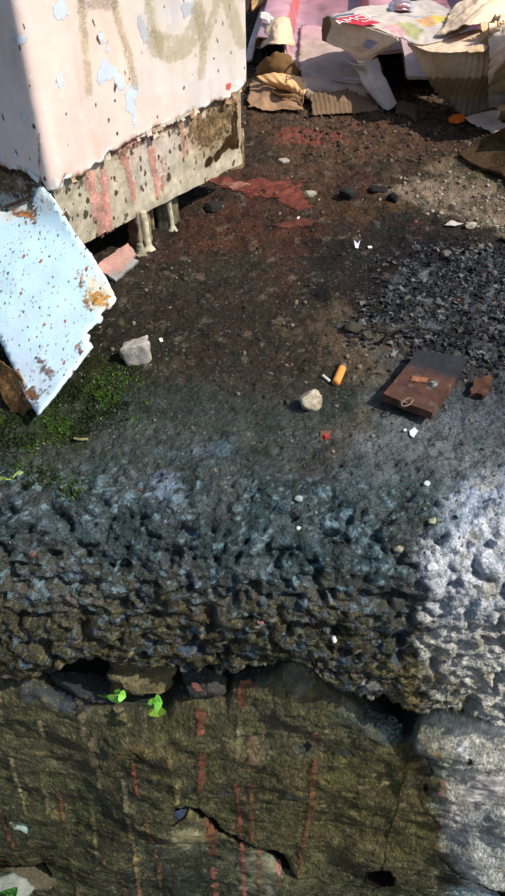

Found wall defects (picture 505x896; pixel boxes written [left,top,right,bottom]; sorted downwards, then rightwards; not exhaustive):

corrosion [76,269,112,310]
corrosion [19,356,55,406]
spalling [353,678,405,744]
crack [172,807,291,870]